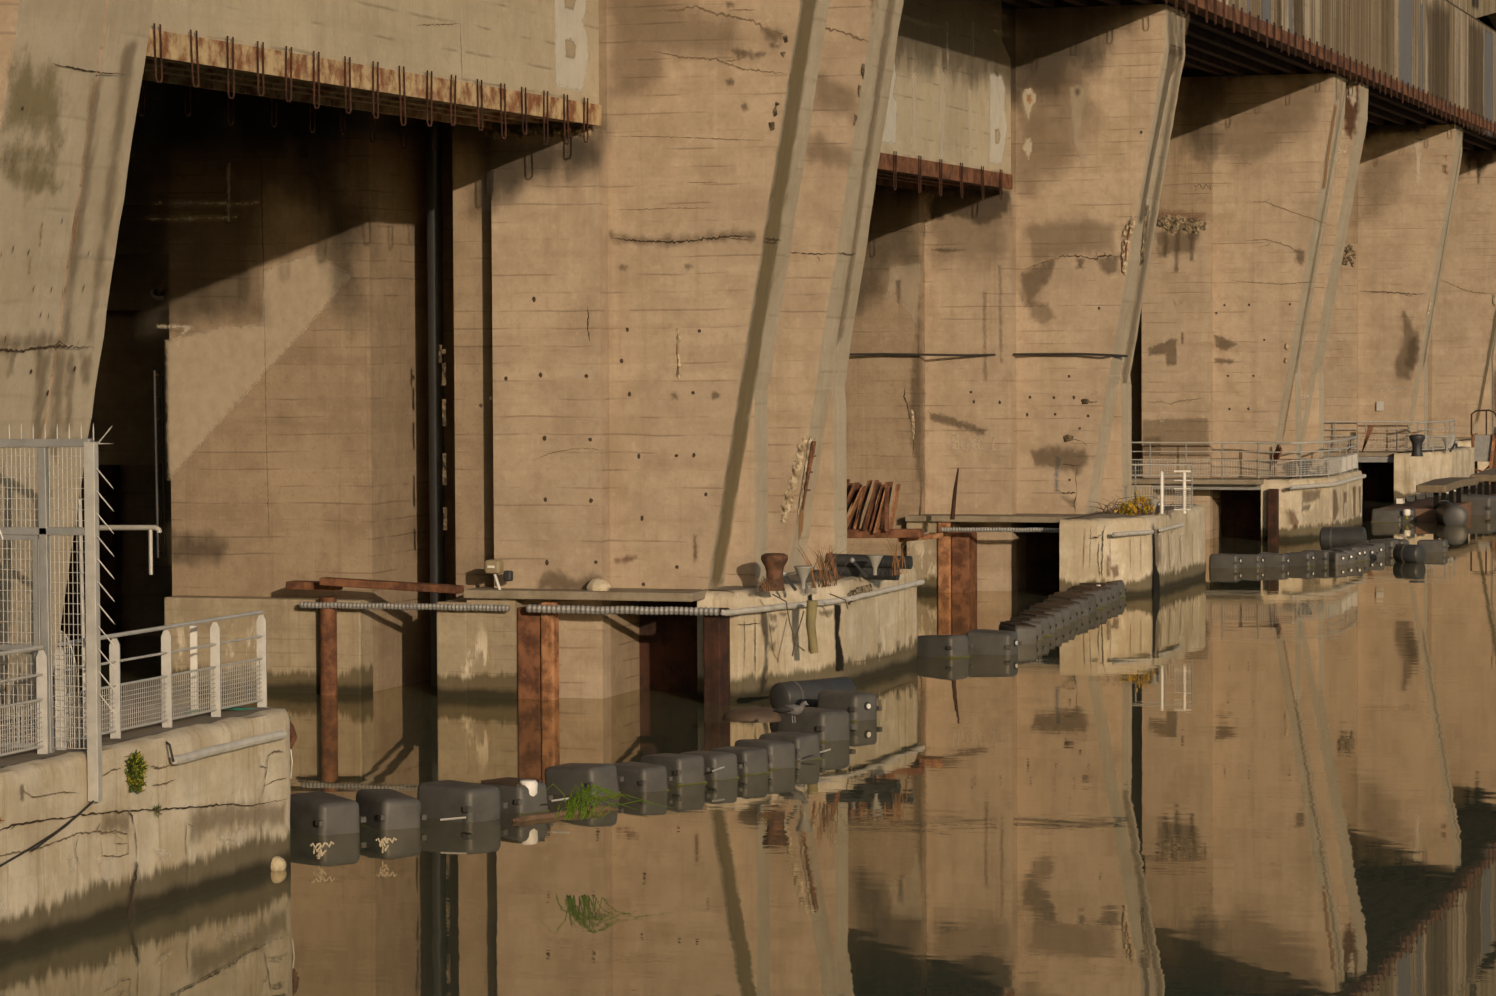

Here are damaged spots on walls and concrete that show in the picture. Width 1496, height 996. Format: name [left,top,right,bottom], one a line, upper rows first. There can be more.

crack [611,134,744,142]
corrosion [1023,88,1036,117]
corrosion [1323,76,1359,188]
crack [614,182,855,263]
spalling [1121,204,1207,276]
crack [0,339,94,352]